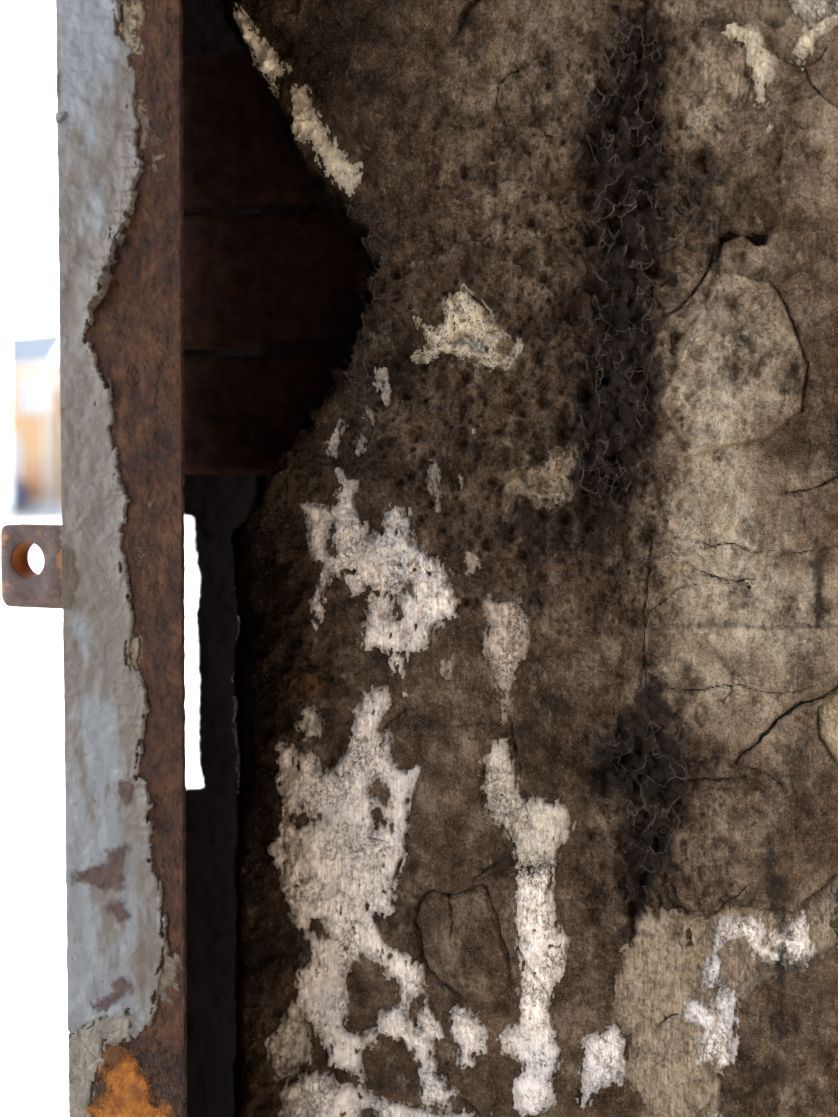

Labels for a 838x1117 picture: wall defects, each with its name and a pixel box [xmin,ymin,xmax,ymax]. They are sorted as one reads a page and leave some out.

spalling [655,0,838,109]
spalling [170,2,379,495]
peeling [362,366,392,426]
spalling [410,283,524,372]
crack [666,241,715,316]
crack [772,285,810,400]
crack [785,476,838,493]
rust [117,779,133,805]
peeling [264,419,582,1117]
crack [414,861,519,997]
spalling [576,872,838,1117]
rust [88,1047,170,1117]